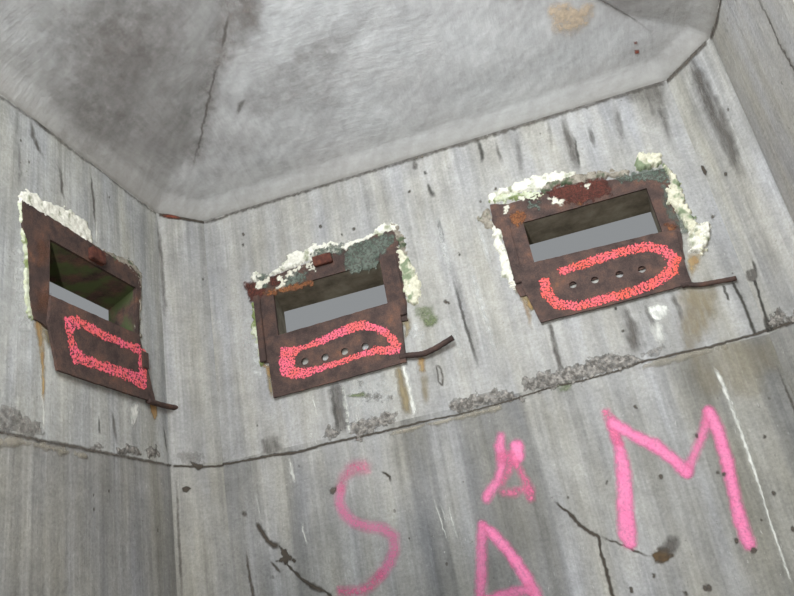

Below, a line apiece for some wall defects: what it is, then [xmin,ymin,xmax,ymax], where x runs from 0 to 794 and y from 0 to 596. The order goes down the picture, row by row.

crack [140,0,721,223]
rust [35,321,50,395]
spalling [325,411,398,442]
crack [0,321,792,468]
rust [397,368,409,411]
spalling [449,349,657,413]
crack [243,512,332,596]
crack [557,503,642,596]